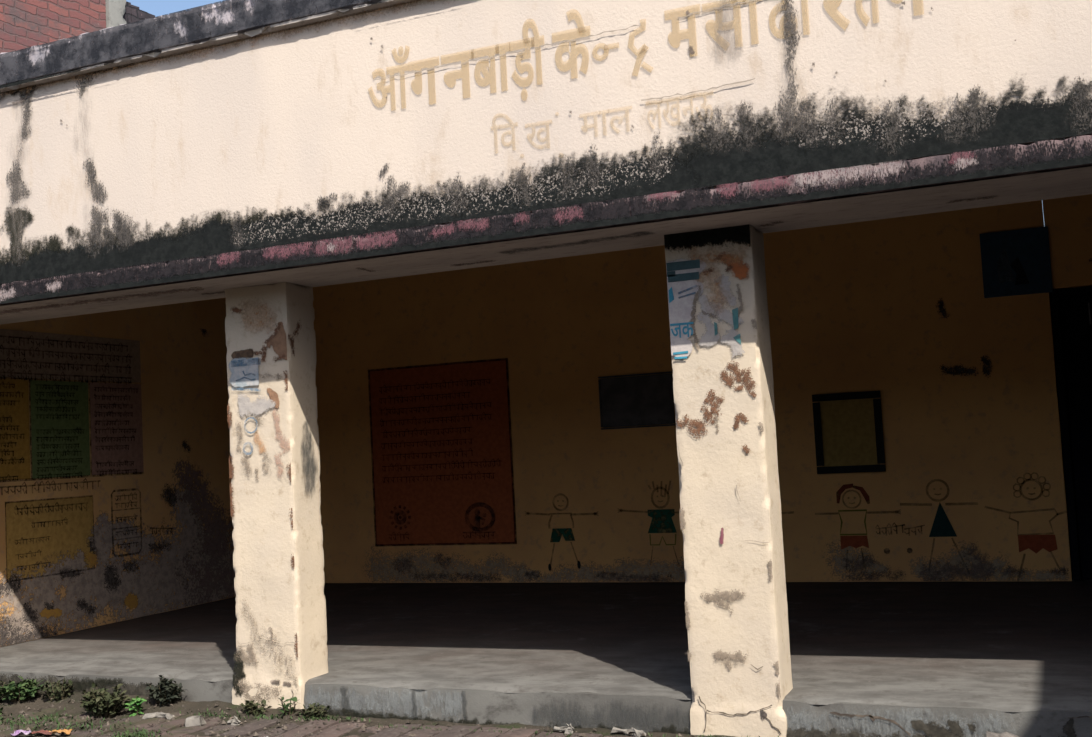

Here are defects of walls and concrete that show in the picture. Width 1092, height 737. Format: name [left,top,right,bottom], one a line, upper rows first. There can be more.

damp [0,0,1092,315]
spalling [227,320,302,518]
peeling [676,361,764,439]
damp [0,440,512,725]
crack [699,696,781,735]